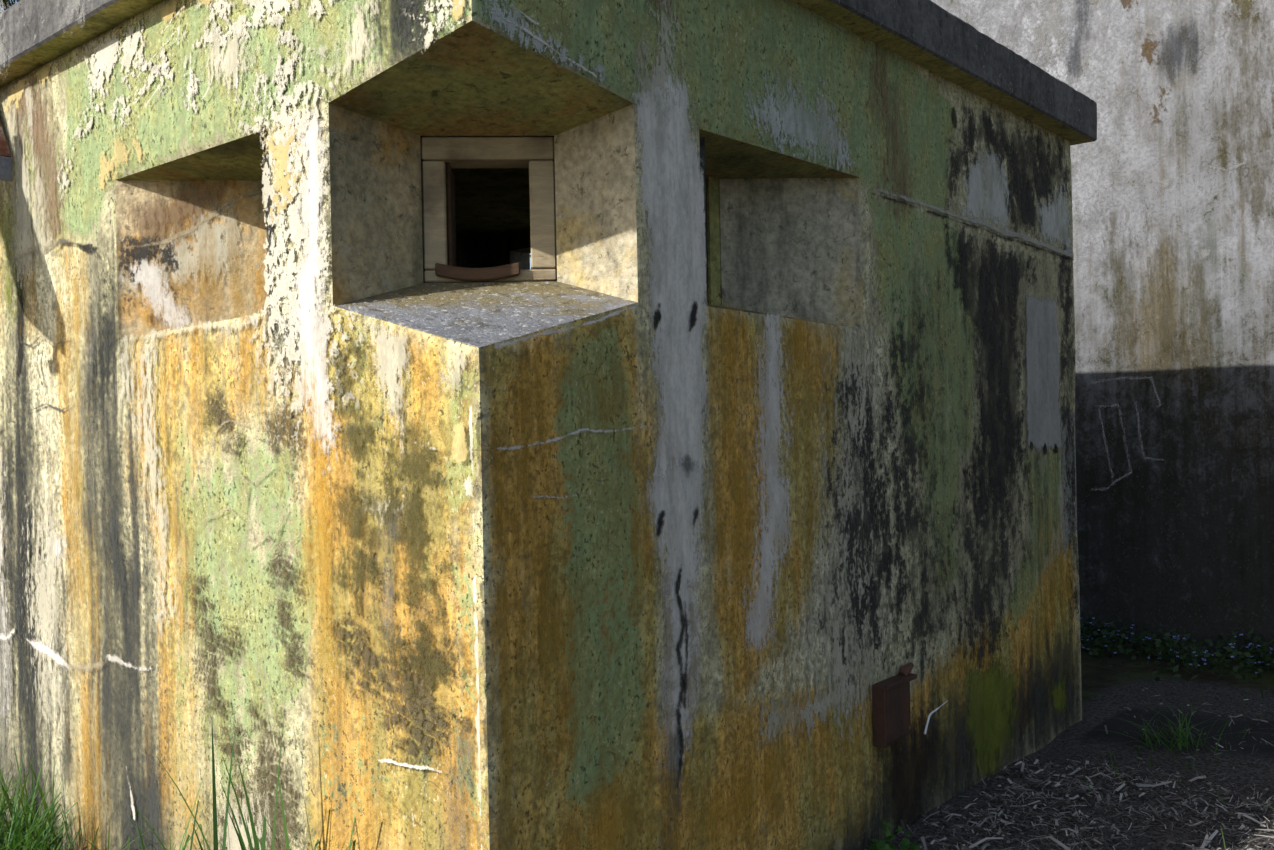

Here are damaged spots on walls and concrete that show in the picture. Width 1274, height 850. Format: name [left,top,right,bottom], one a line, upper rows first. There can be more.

peeling [3,0,379,500]
damp [370,0,440,59]
peeling [410,0,465,49]
damp [745,71,856,172]
damp [0,207,74,841]
crack [0,620,153,693]
crack [126,767,135,820]
damp [78,180,250,850]
damp [329,319,459,698]
crack [666,564,699,788]
damp [743,314,793,652]
damp [757,104,1080,850]